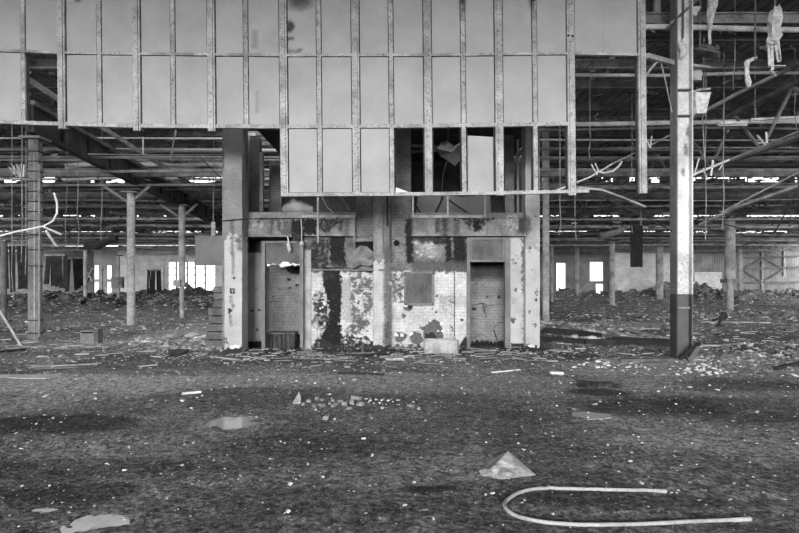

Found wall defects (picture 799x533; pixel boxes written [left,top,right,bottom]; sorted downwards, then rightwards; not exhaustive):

damp [404,217,504,278]
damp [269,218,373,349]
peeling [342,271,373,335]
flaking render [372,311,463,349]